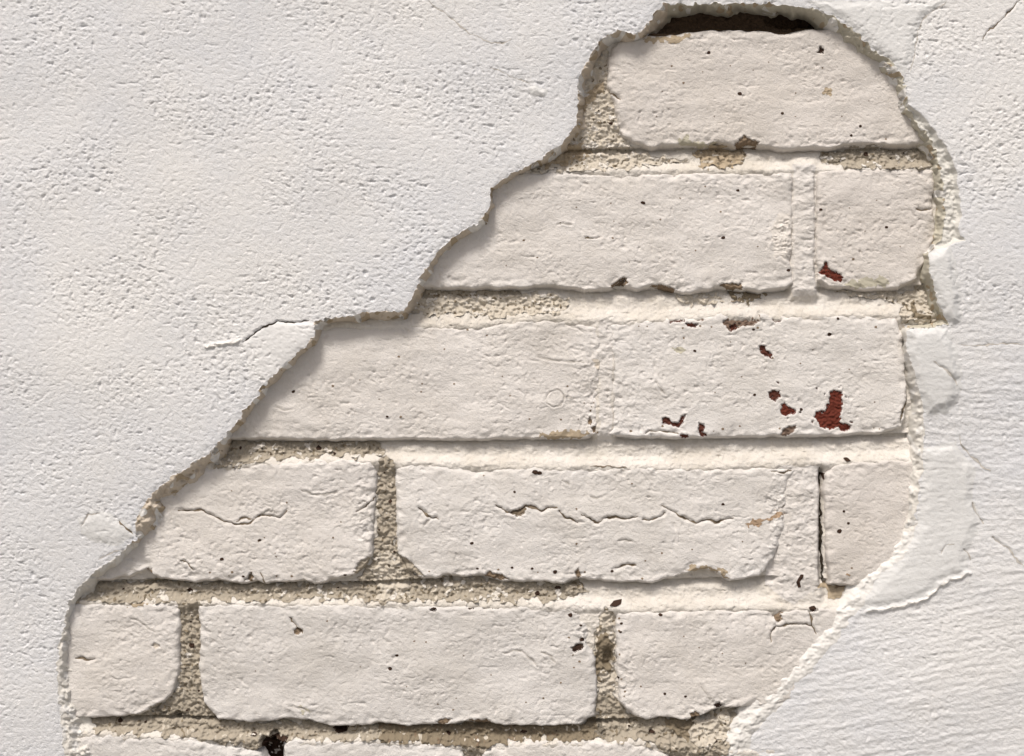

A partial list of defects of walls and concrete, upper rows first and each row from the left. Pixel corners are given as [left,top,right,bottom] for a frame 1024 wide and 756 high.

peeling [486,2,965,249]
peeling [768,211,792,272]
crack [243,320,309,342]
crack [178,489,337,525]
peeling [56,228,968,756]
crack [496,480,734,568]
crack [796,467,824,588]